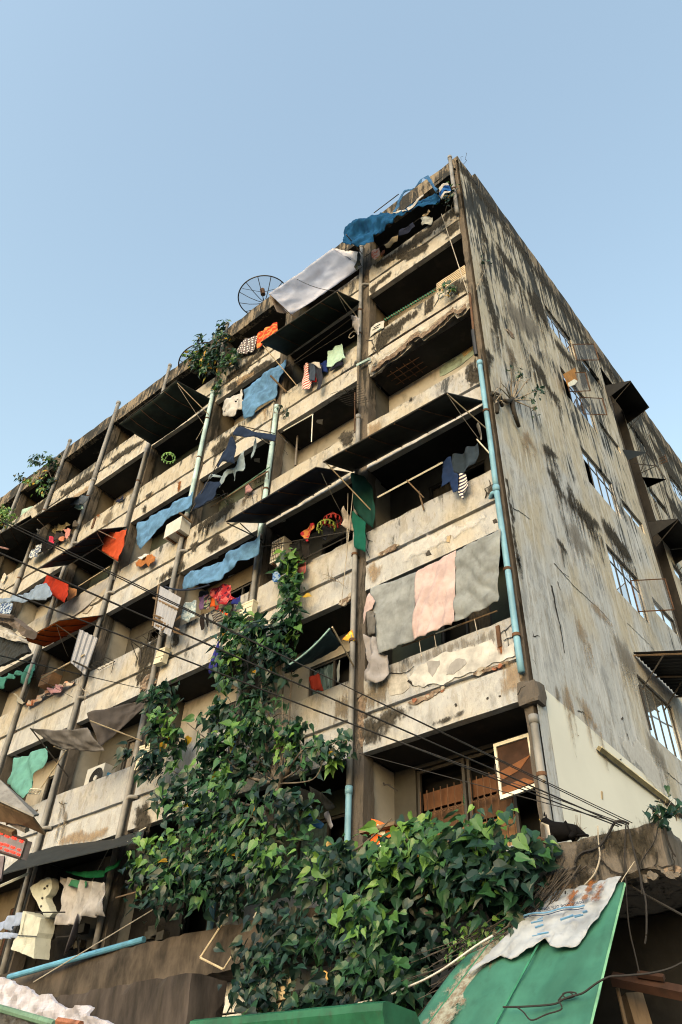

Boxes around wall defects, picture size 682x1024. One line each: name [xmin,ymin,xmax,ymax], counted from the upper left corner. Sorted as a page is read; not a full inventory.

water stain [459,162,619,416]
water stain [156,481,254,582]
water stain [523,432,639,582]
water stain [632,414,682,523]
water stain [359,630,494,745]
peeling [387,639,515,705]
water stain [556,687,607,762]
water stain [591,604,637,695]
water stain [647,731,670,785]
water stain [55,801,108,845]
water stain [134,802,152,835]
spalling [641,865,682,884]